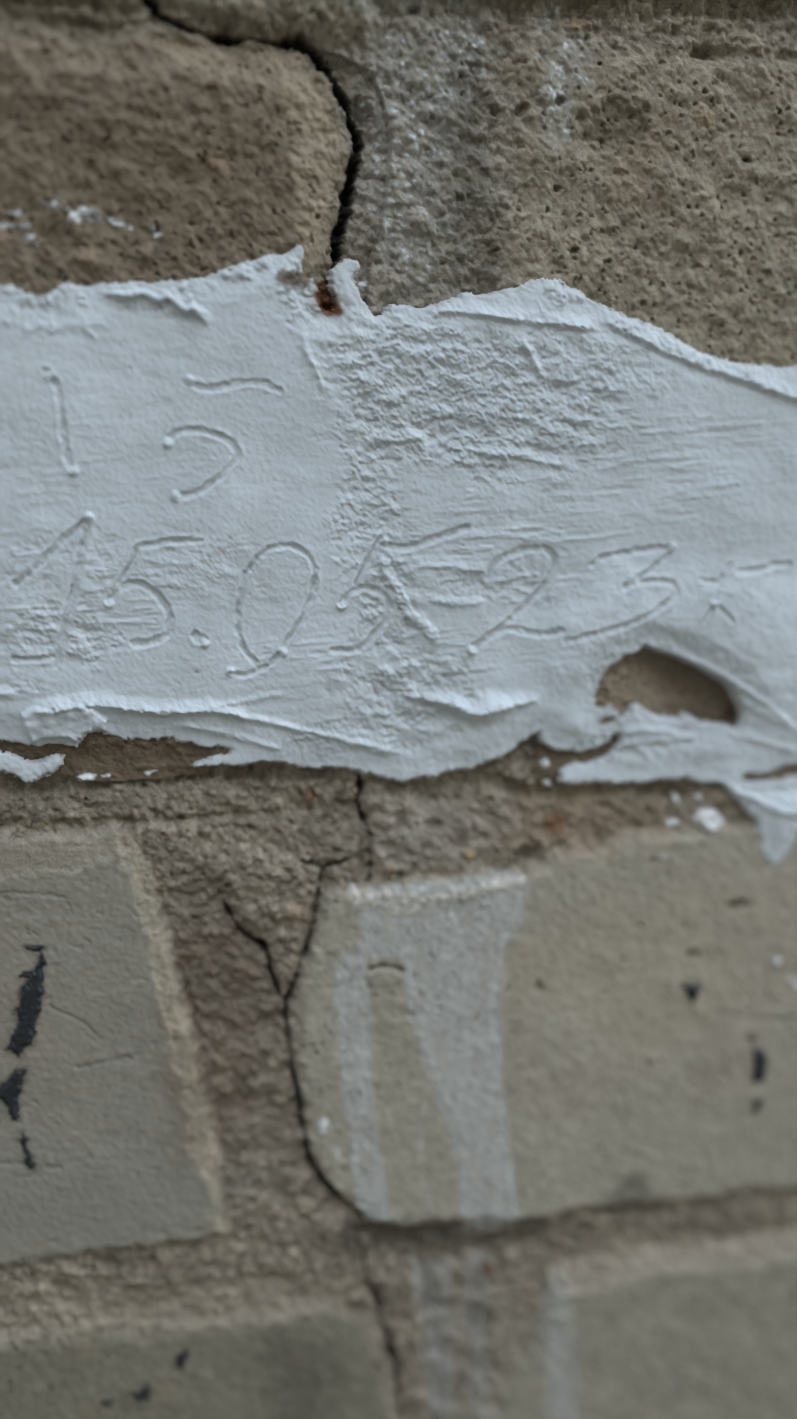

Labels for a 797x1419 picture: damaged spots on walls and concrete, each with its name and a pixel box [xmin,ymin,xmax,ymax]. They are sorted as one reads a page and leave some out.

crack [140,0,366,297]
spalling [0,703,228,781]
spalling [530,646,739,787]
crack [217,771,404,1419]